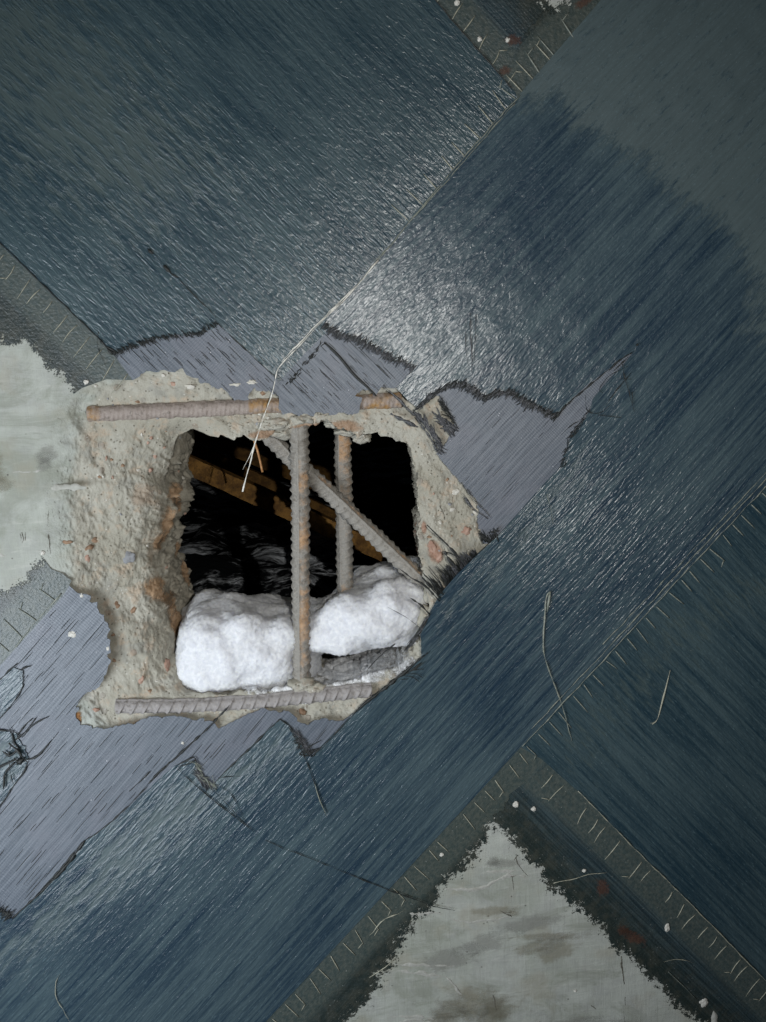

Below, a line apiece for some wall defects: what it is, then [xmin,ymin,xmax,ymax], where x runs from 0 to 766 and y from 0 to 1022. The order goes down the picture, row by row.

rust [144,578,181,637]
spalling [0,265,639,922]